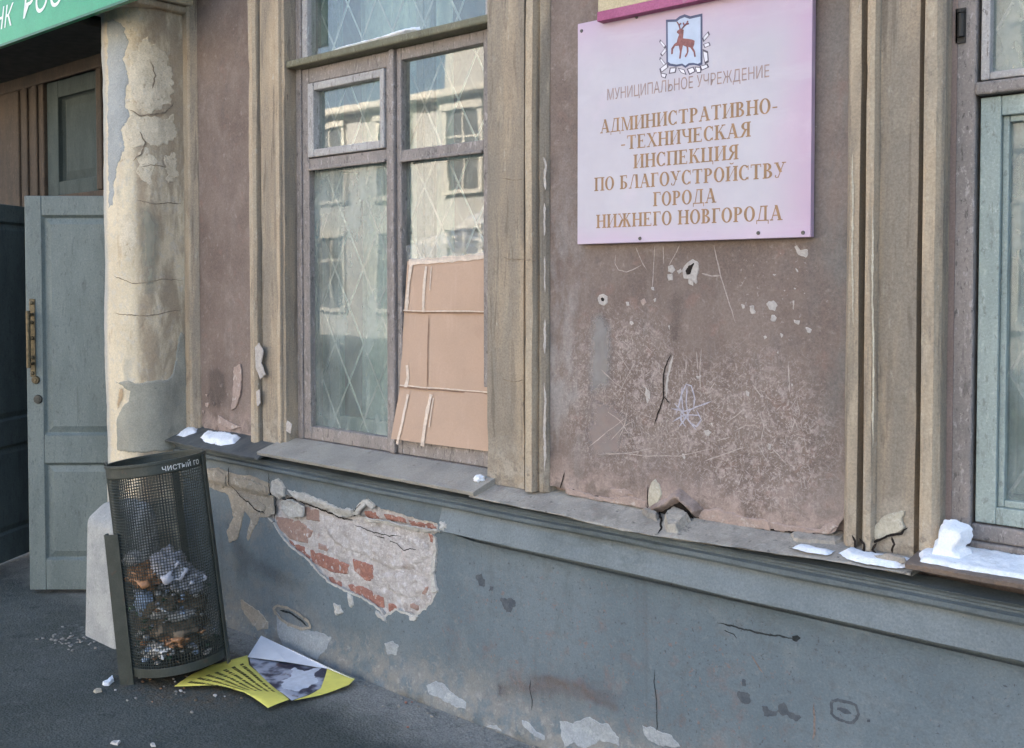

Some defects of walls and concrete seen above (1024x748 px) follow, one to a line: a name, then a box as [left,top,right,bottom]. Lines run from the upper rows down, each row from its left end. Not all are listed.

flaking render [122,37,179,185]
flaking render [119,212,137,260]
hole [667,259,699,286]
peeling [255,343,266,406]
crack [654,355,673,424]
peeling [874,511,905,540]
spalling [207,467,447,623]
peeling [240,600,268,631]
crack [719,623,800,642]
peeling [427,681,466,709]
peeling [560,717,619,748]